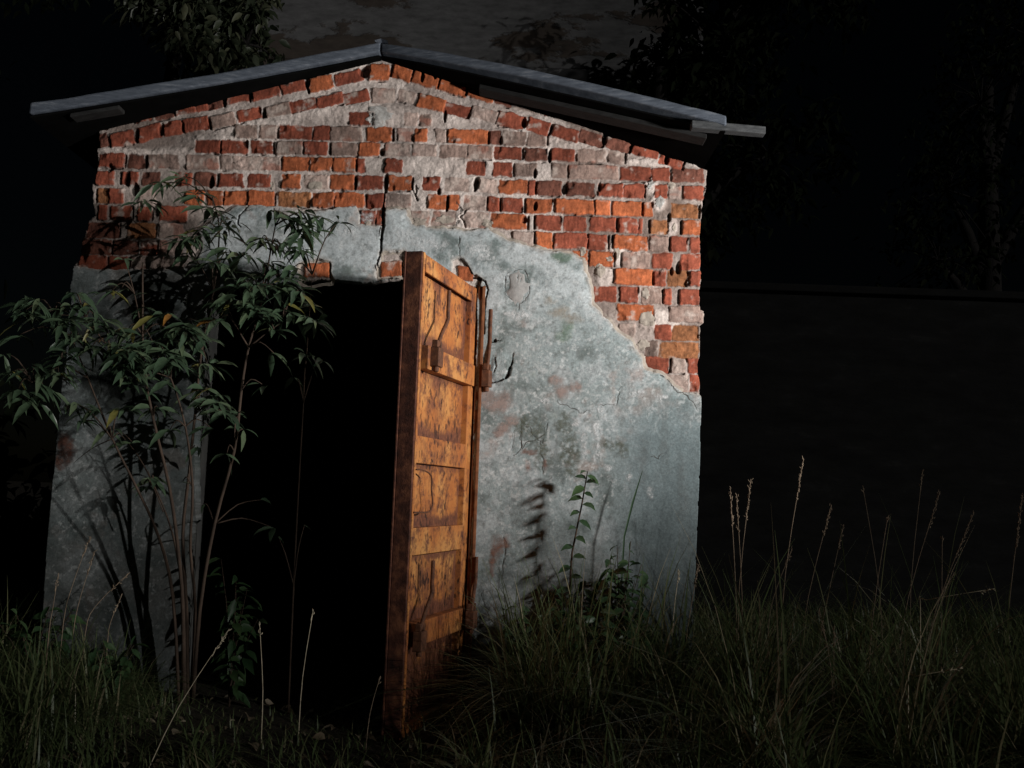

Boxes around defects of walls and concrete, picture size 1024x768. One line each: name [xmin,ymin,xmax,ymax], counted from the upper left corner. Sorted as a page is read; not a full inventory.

spalling [647,180,676,209]
crack [375,195,386,271]
spalling [297,260,335,288]
spalling [386,206,683,392]
crack [511,386,626,474]